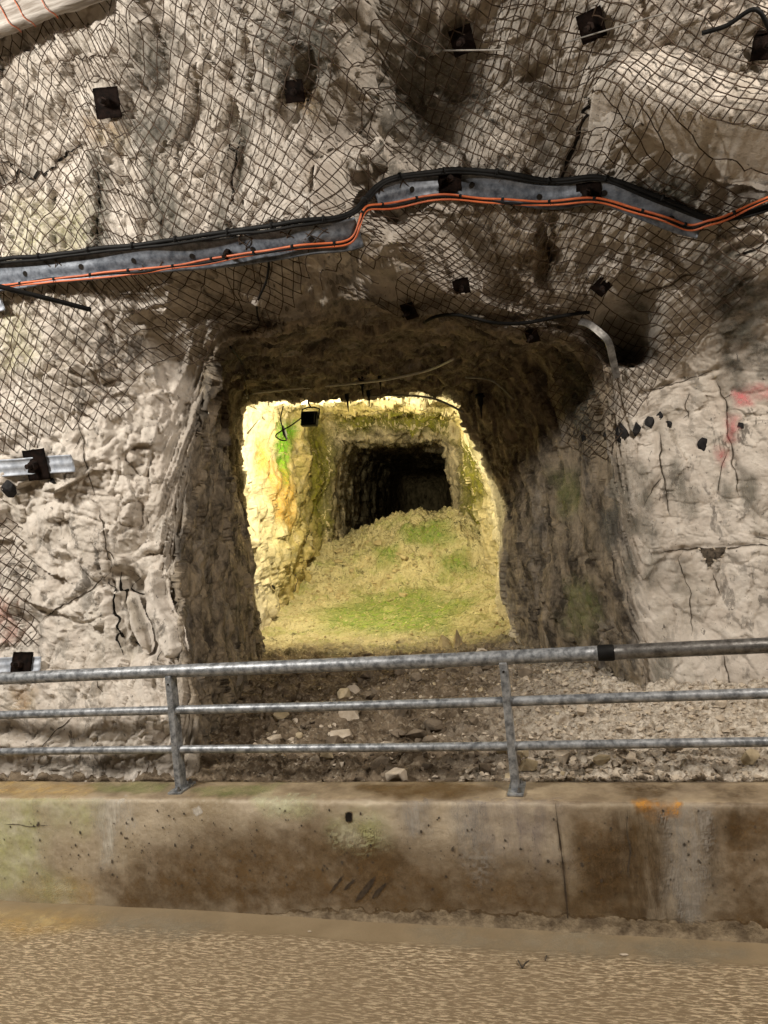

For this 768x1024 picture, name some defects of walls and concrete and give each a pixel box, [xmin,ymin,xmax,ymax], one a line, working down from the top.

crack [648,436,669,512]
crack [639,370,739,495]
crack [43,413,162,661]
water stain [105,808,768,929]